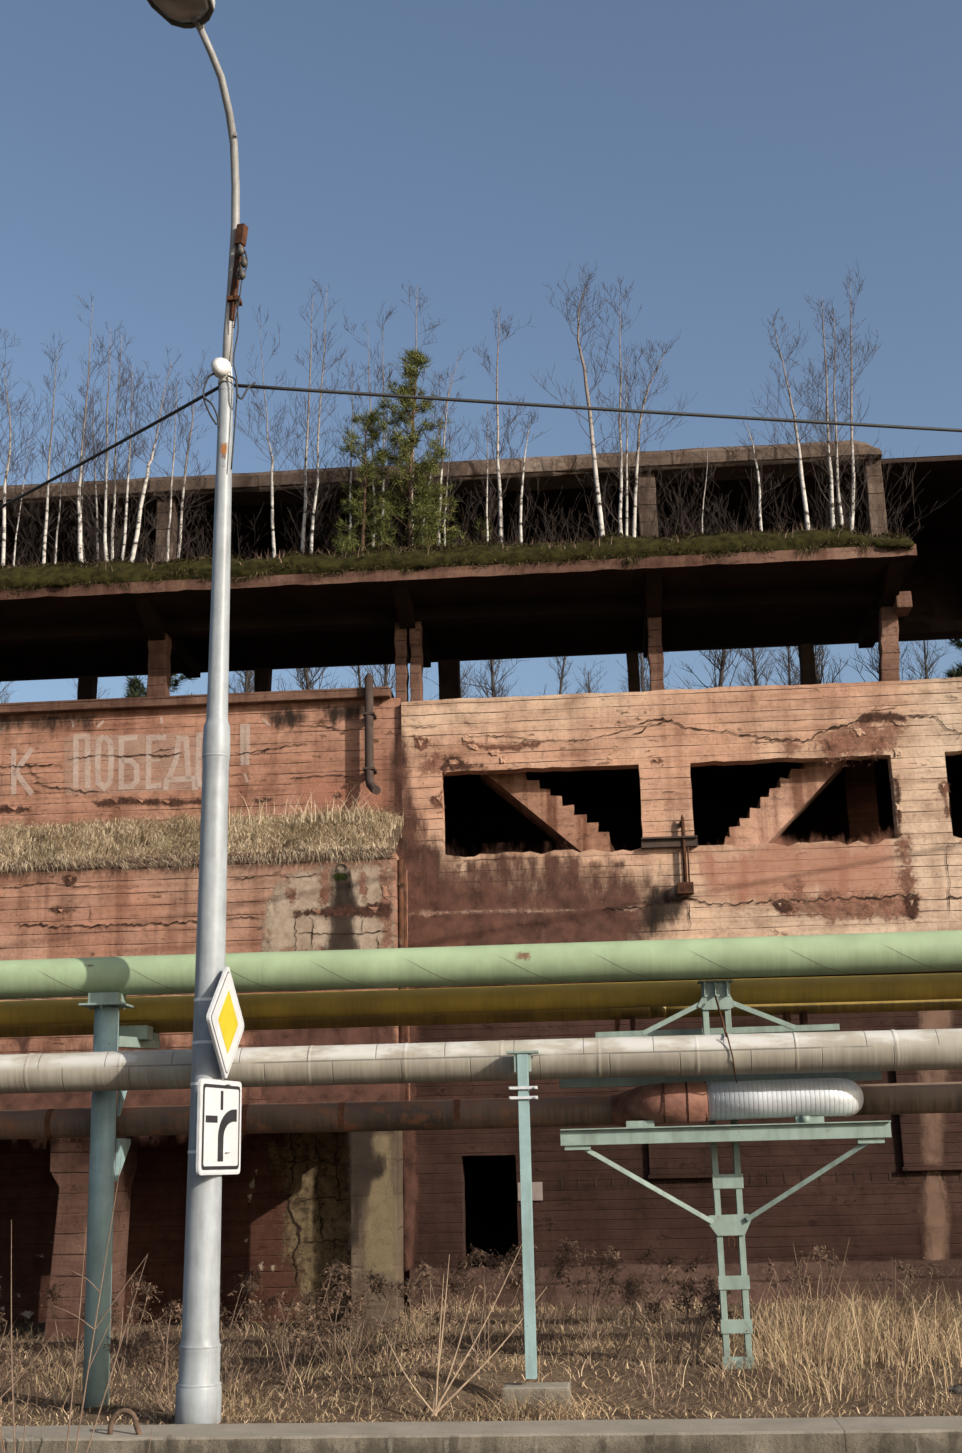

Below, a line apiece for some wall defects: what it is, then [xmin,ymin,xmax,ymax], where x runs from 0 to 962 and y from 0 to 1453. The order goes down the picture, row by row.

crack [407,715,865,750]
crack [906,714,962,736]
peeling [262,864,396,952]
damp [396,833,669,948]
corrosion [241,1104,249,1134]